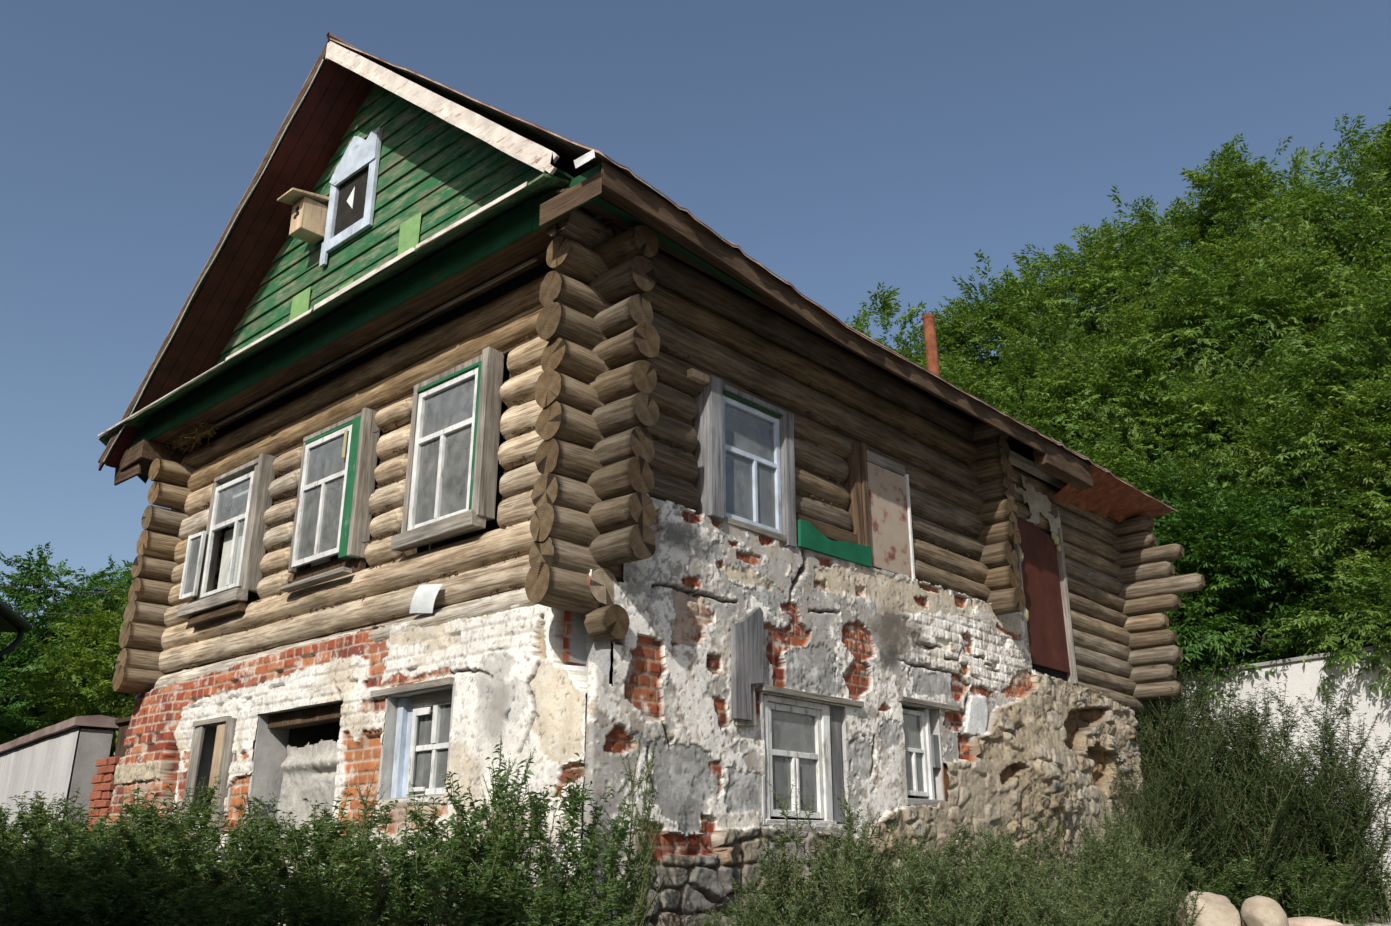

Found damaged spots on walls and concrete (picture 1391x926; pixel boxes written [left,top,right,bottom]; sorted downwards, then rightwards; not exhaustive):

spalling [106,591,524,843]
flaking render [473,506,875,866]
flaking render [844,704,904,785]
flaking render [813,556,1038,762]
spalling [1000,763,1026,786]
spalling [1064,705,1118,789]